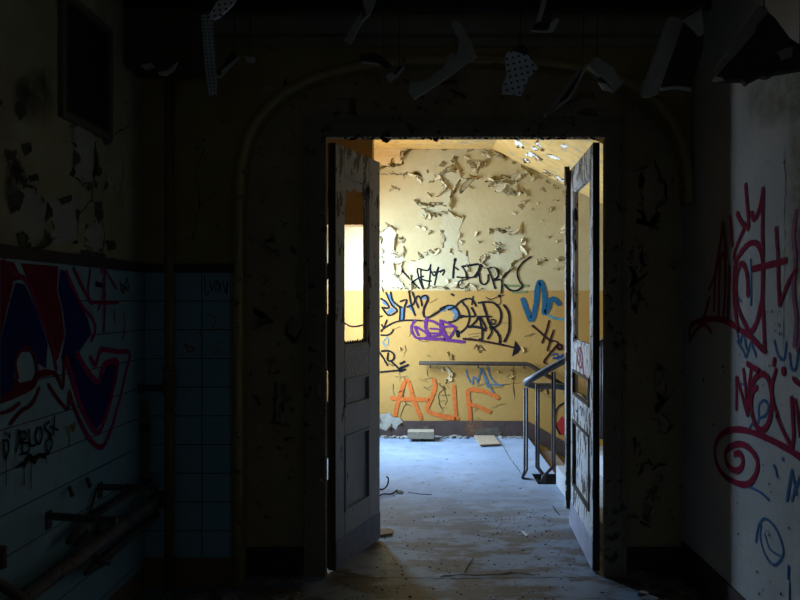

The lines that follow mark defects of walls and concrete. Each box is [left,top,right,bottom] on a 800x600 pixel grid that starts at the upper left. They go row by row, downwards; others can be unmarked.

peeling [340,135,596,292]